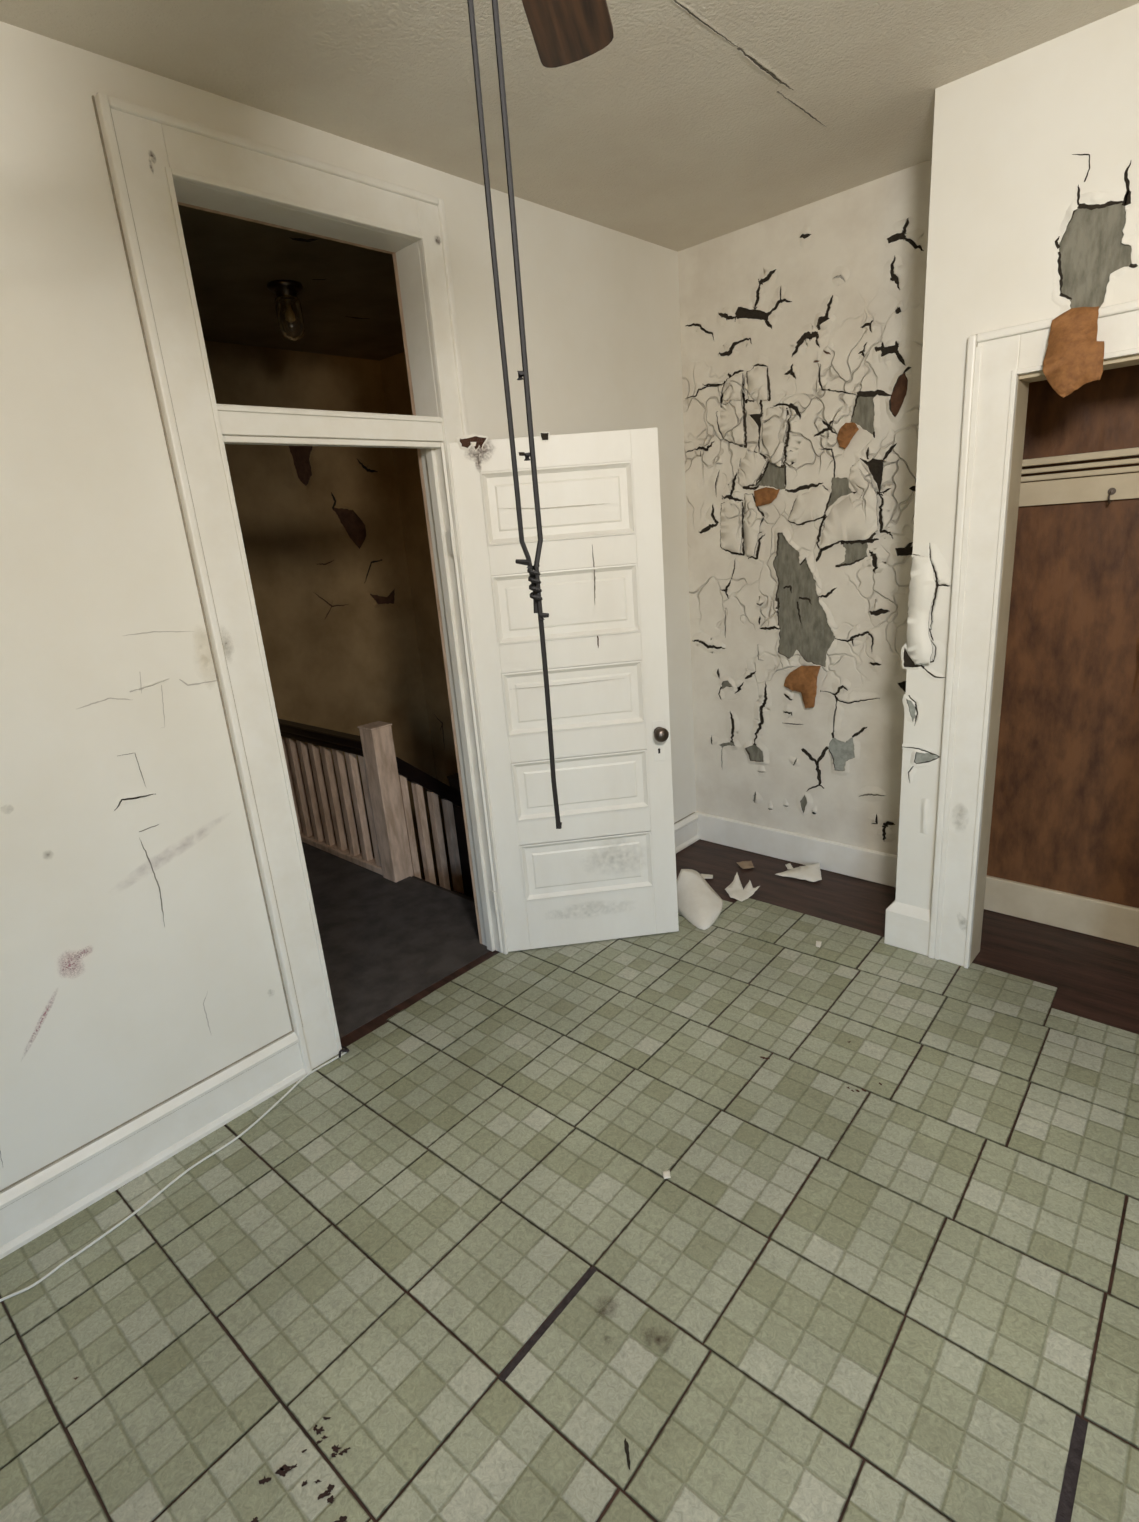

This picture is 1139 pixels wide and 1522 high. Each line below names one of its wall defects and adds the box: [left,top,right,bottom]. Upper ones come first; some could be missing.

crack [667,0,827,127]
peeling [1042,154,1139,398]
peeling [743,398,791,507]
peeling [770,337,916,709]
spalling [707,668,741,770]
peeling [795,727,867,819]
spalling [891,643,946,696]
spalling [902,743,941,783]